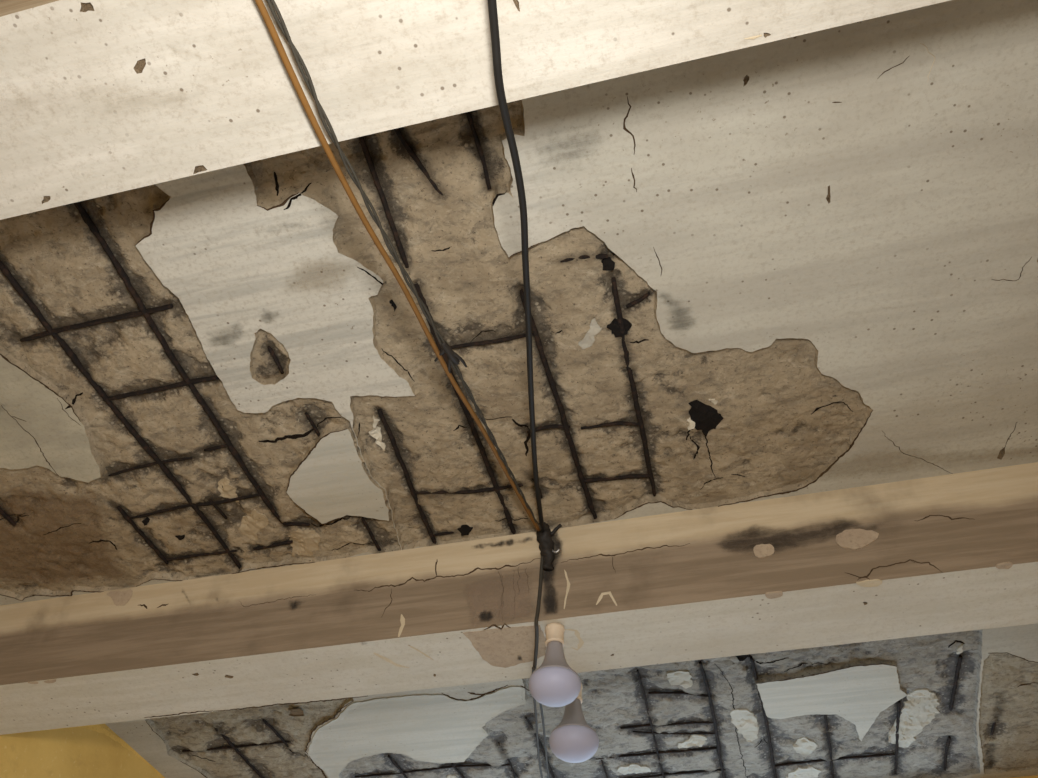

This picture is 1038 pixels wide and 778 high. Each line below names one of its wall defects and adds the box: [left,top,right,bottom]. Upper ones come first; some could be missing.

crack [623,97,637,192]
spalling [0,100,873,606]
damp [724,521,852,550]
flaking render [463,578,546,668]
crack [357,543,690,630]
peeling [856,579,882,587]
spalling [145,629,1038,778]